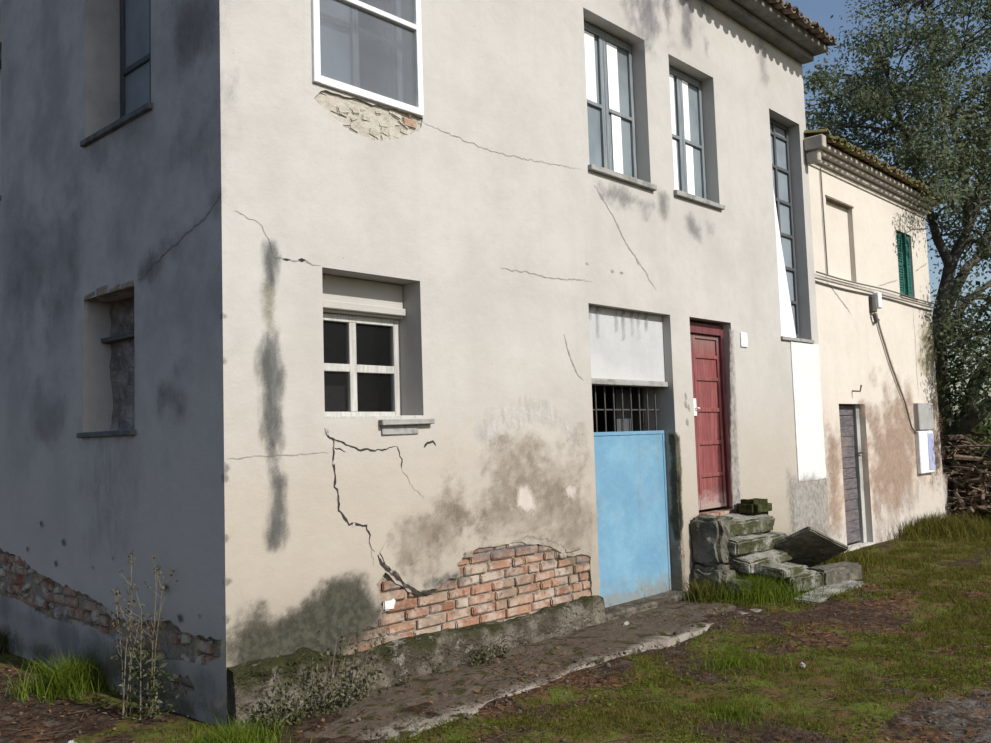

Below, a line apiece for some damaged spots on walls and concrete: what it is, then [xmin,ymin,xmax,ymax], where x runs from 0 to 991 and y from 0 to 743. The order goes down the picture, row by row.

flaking render [314,91,421,142]
crack [425,123,568,167]
crack [137,192,320,281]
leakage [266,245,278,286]
crack [594,185,656,289]
leakage [262,338,283,451]
leakage [863,387,916,518]
leakage [268,465,286,548]
crack [229,430,447,595]
flaking render [0,548,222,665]
leakage [222,573,385,666]
flaking render [343,542,600,655]